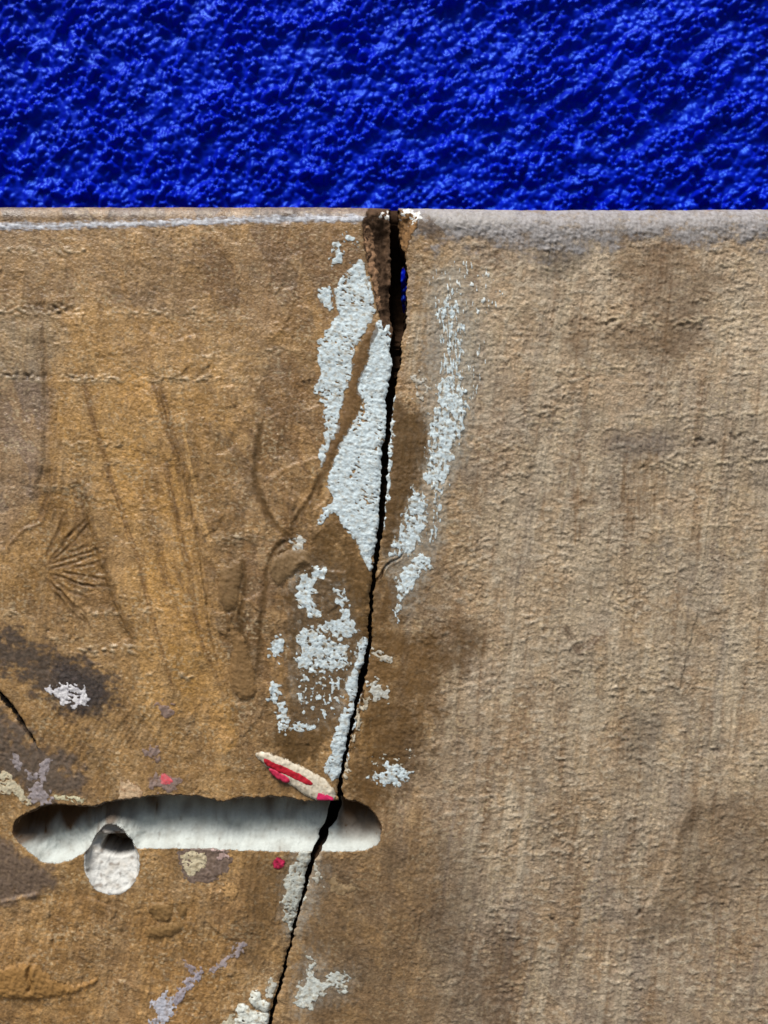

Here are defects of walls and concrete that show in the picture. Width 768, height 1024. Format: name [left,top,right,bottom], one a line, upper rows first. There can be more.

crack [0,691,40,749]
crack [269,208,409,1024]